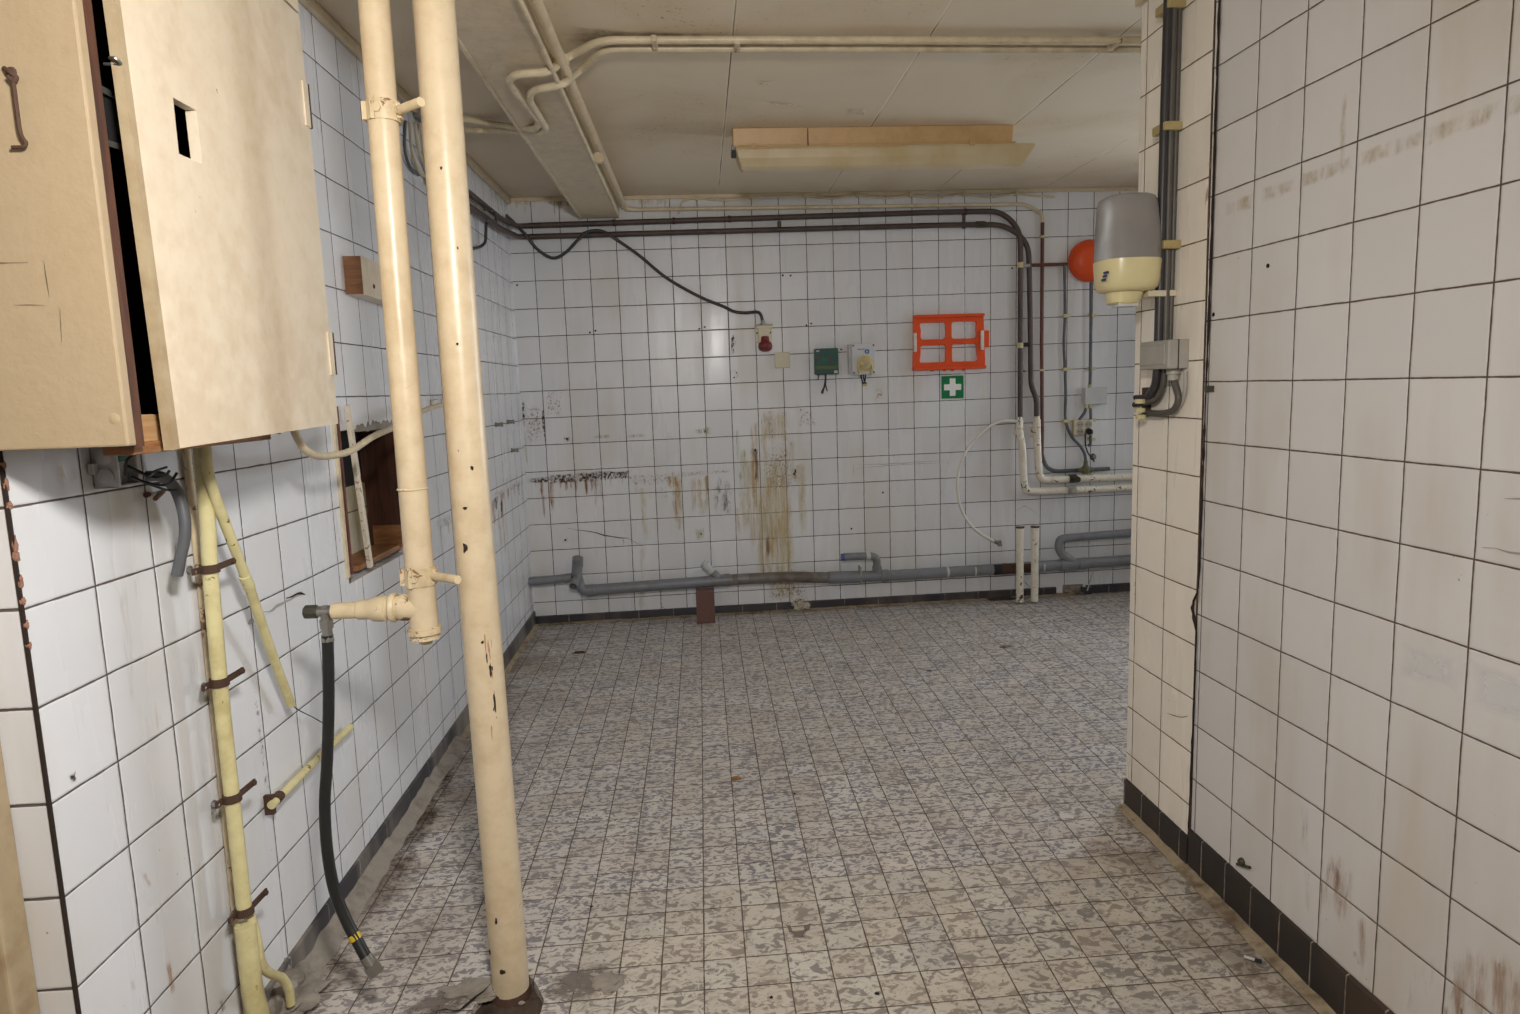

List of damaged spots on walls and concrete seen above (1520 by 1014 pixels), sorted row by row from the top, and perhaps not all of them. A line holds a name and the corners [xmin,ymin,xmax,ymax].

corrosion [495,471,724,512]